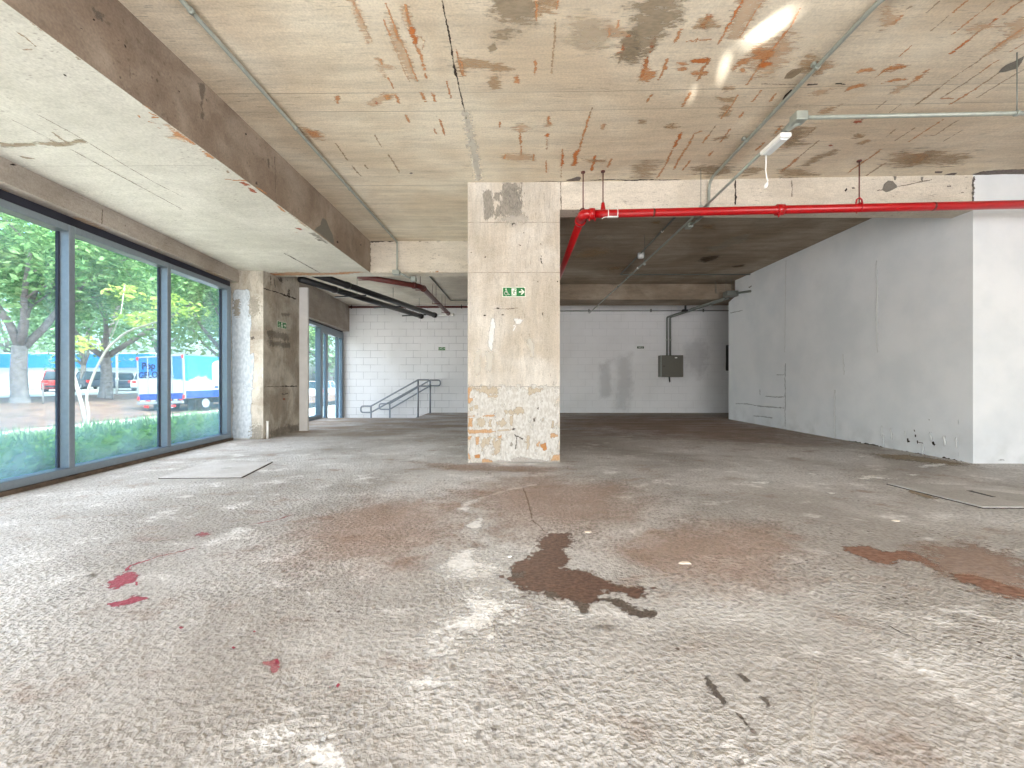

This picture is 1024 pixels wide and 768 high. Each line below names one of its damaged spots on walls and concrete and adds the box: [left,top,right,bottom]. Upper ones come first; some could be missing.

rust [383,3,452,102]
crack [442,0,482,181]
damp [615,0,684,65]
rust [637,45,710,102]
rust [560,116,590,166]
rust [656,129,731,178]
peeling [468,384,560,463]
damp [422,533,659,659]
damp [401,672,454,692]